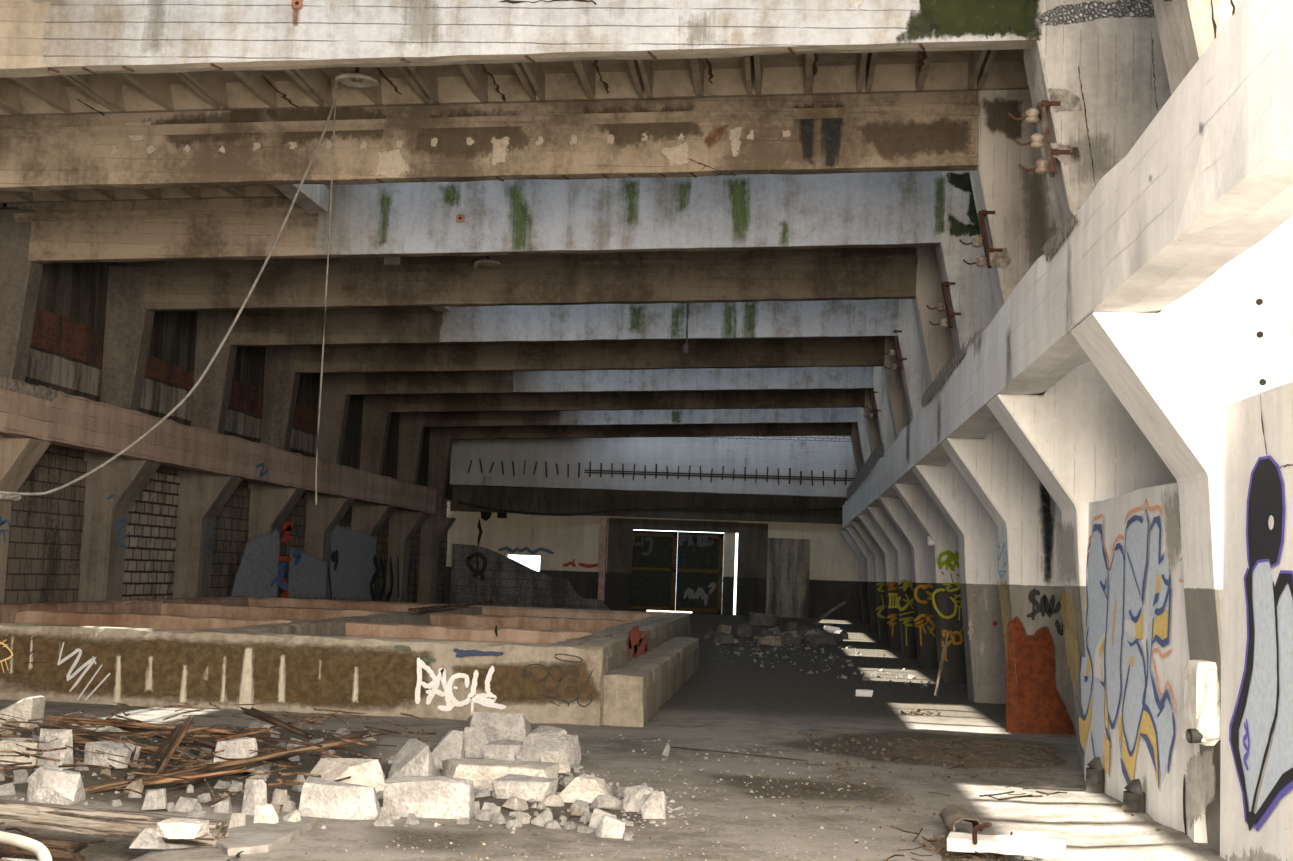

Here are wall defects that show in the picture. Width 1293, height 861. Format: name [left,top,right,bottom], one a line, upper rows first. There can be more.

crack [500,0,597,8]
crack [1211,0,1236,40]